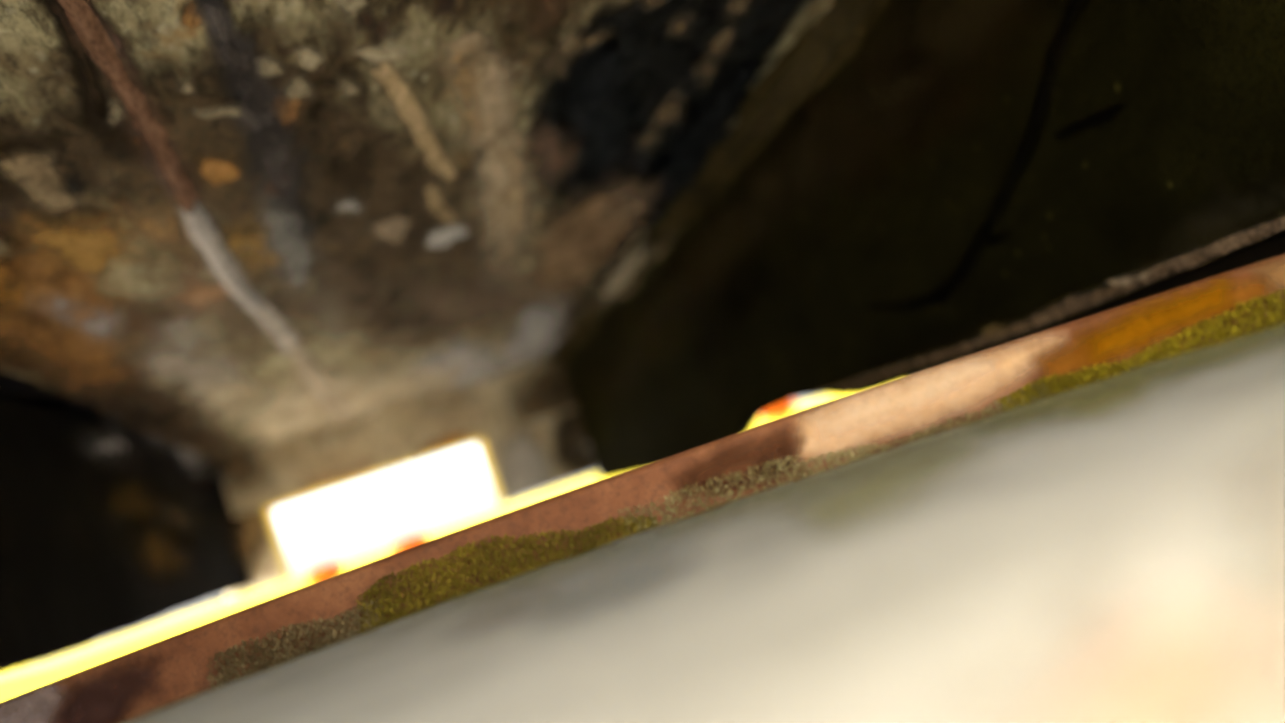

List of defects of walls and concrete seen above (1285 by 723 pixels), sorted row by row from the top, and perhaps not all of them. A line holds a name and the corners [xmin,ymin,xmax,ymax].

rust [276,94,300,126]
rust [0,0,239,389]
water stain [0,0,878,499]
rust [1039,277,1274,382]
rust [422,433,467,453]